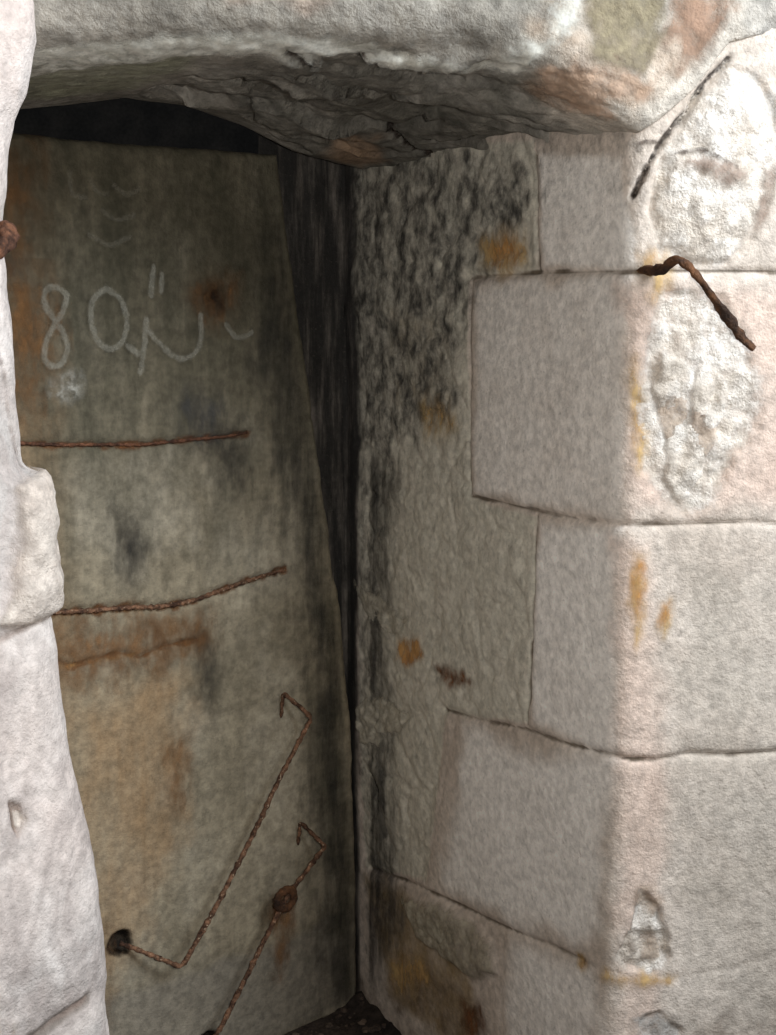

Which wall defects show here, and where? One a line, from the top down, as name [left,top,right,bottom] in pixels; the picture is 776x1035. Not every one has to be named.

crack [631,56,737,199]
corrosion [645,256,664,290]
corrosion [632,563,643,640]